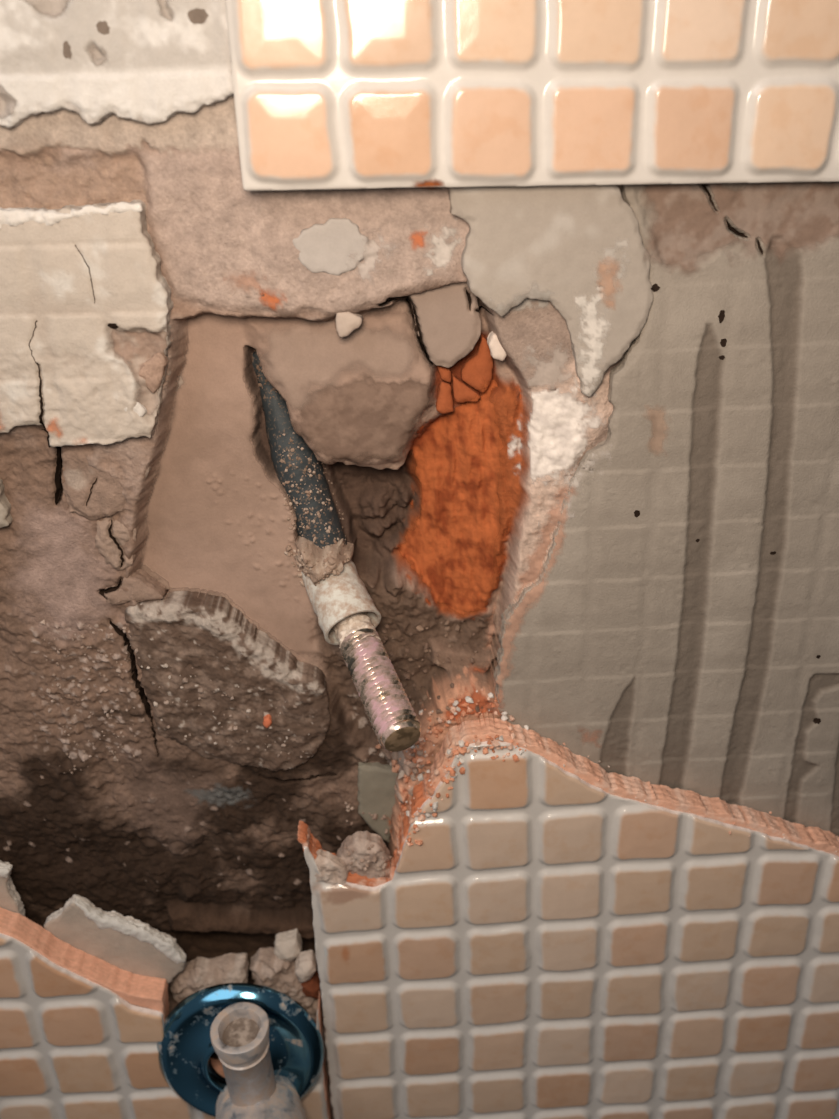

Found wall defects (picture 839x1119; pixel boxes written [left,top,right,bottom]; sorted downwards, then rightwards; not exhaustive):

peeling [25,0,68,16]
peeling [158,0,173,20]
peeling [0,85,16,119]
crack [701,184,763,255]
crack [379,296,433,365]
spalling [487,331,507,361]
crack [29,321,97,506]
spalling [111,312,431,654]
flaking render [396,379,510,619]
crack [99,520,158,757]